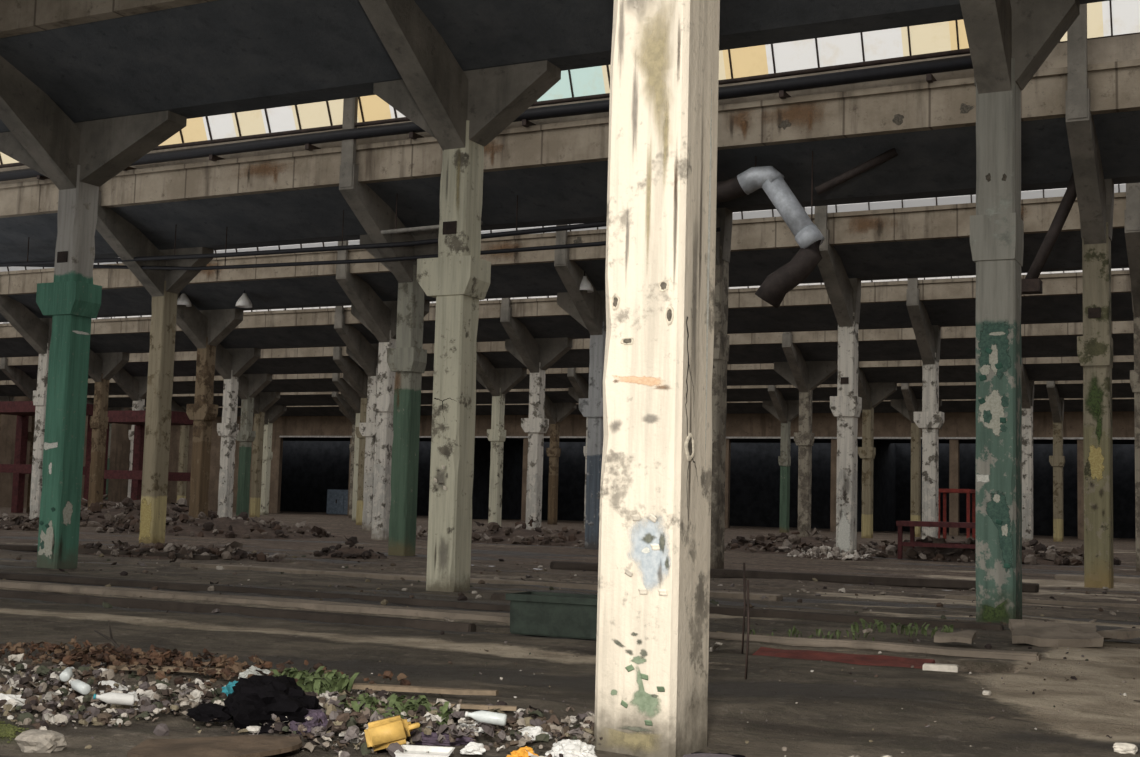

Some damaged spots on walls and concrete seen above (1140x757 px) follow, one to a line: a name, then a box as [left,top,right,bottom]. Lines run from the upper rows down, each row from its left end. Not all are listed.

leakage [633,26,668,165]
peeling [978,321,1011,436]
peeling [38,501,73,559]
peeling [625,514,669,596]
peeling [976,474,1013,573]
peeling [1088,445,1104,515]
peeling [611,632,665,732]